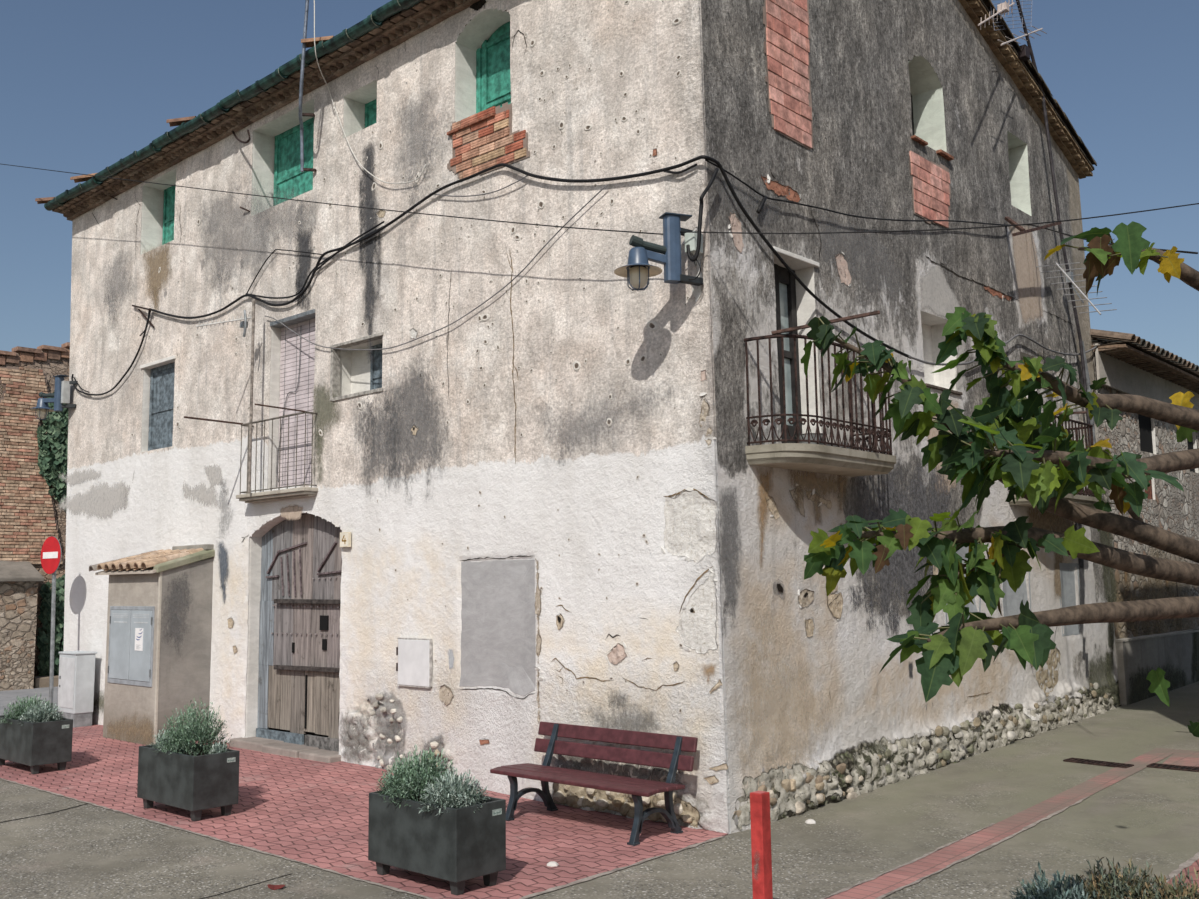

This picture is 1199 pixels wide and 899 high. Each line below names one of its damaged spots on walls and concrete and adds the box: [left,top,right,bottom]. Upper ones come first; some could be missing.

leakage [359,144,381,363]
leakage [1009,223,1043,322]
leakage [358,367,446,482]
spalling [642,488,719,671]
leakage [790,459,952,633]
crack [460,658,683,699]